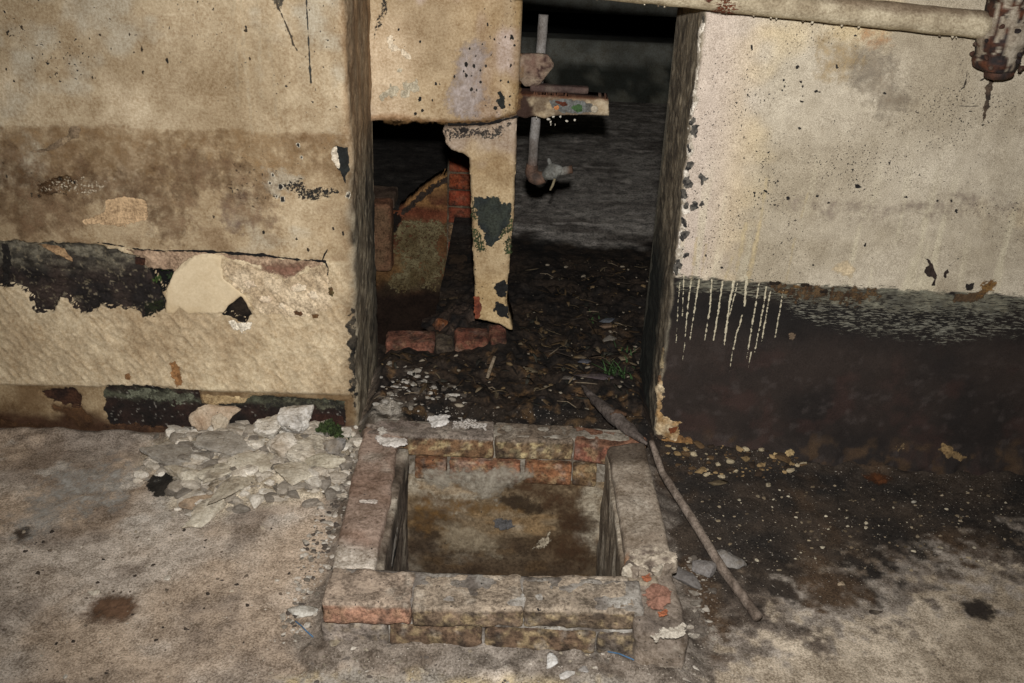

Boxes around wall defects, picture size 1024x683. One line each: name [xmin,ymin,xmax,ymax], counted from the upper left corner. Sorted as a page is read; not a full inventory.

damp [0,126,351,238]
peeling [331,146,350,183]
peeling [673,16,709,276]
rust [980,78,994,126]
spalling [0,237,334,333]
crack [97,242,329,275]
damp [676,222,784,366]
rust [953,279,997,303]
flaking render [201,394,250,405]
spalling [287,347,693,680]